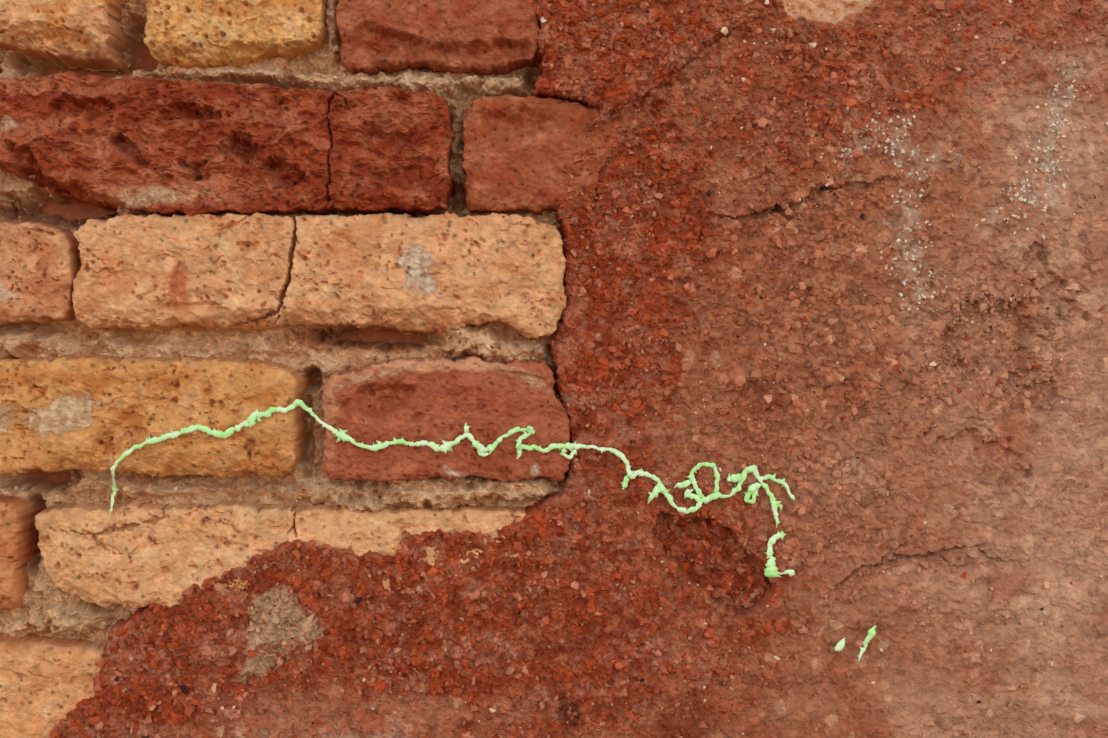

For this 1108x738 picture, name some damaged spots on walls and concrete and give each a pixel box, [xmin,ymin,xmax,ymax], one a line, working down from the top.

spalling [781,0,874,25]
spalling [229,39,267,61]
spalling [346,19,536,70]
spalling [0,134,73,199]
crack [696,175,891,229]
spalling [46,92,779,738]
crack [817,542,1027,600]